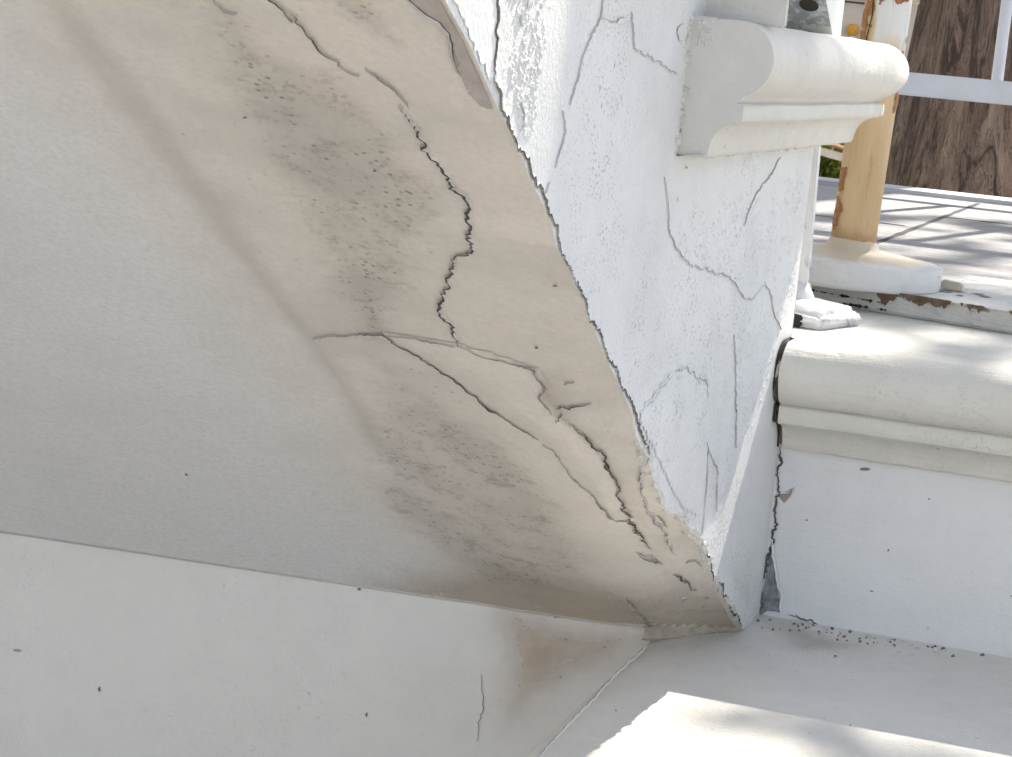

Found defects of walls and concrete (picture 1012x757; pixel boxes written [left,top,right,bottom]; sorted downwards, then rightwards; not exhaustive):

crack [213,0,238,15]
rust [860,0,909,40]
rust [832,167,847,230]
crack [268,0,792,627]
crack [788,614,832,627]
crack [538,600,650,757]